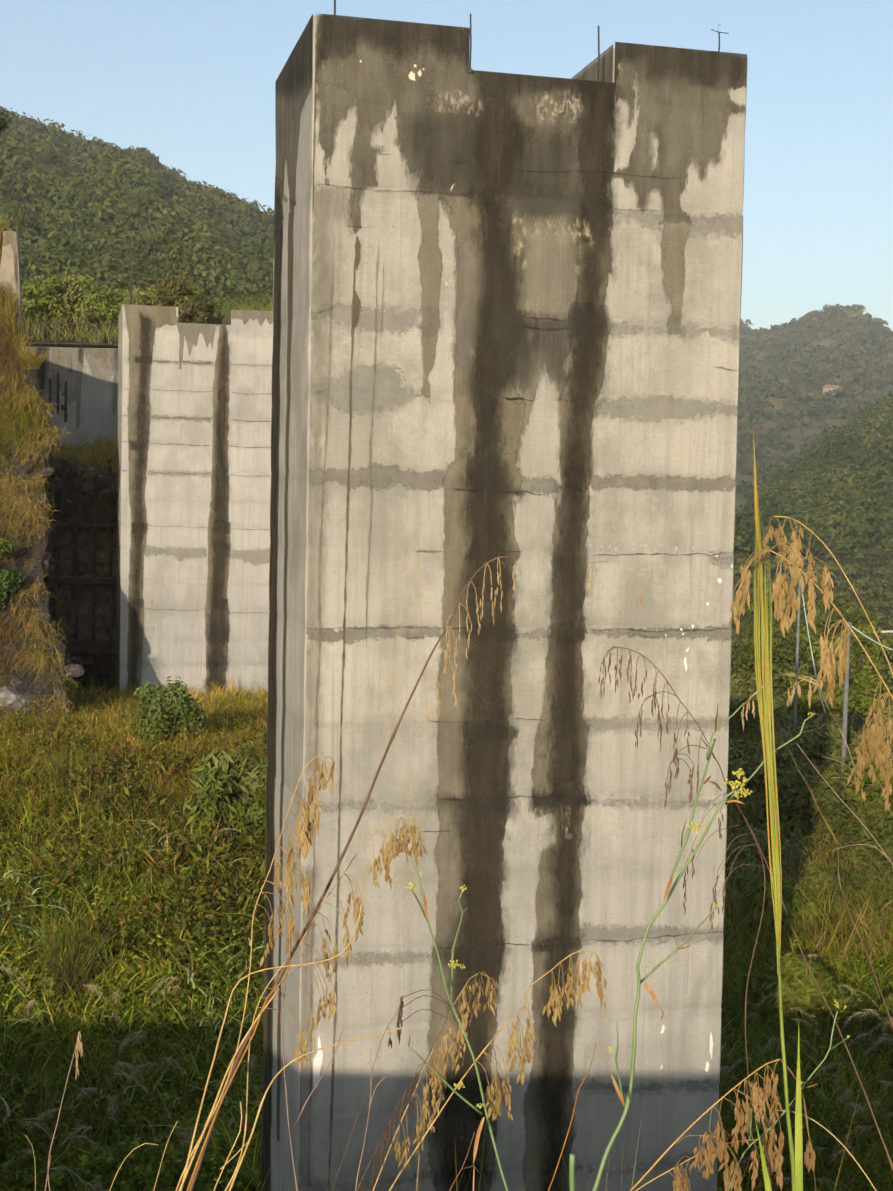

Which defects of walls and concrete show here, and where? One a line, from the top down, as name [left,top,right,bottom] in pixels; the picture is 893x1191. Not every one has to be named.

damp [20,347,118,429]
damp [124,14,747,1191]